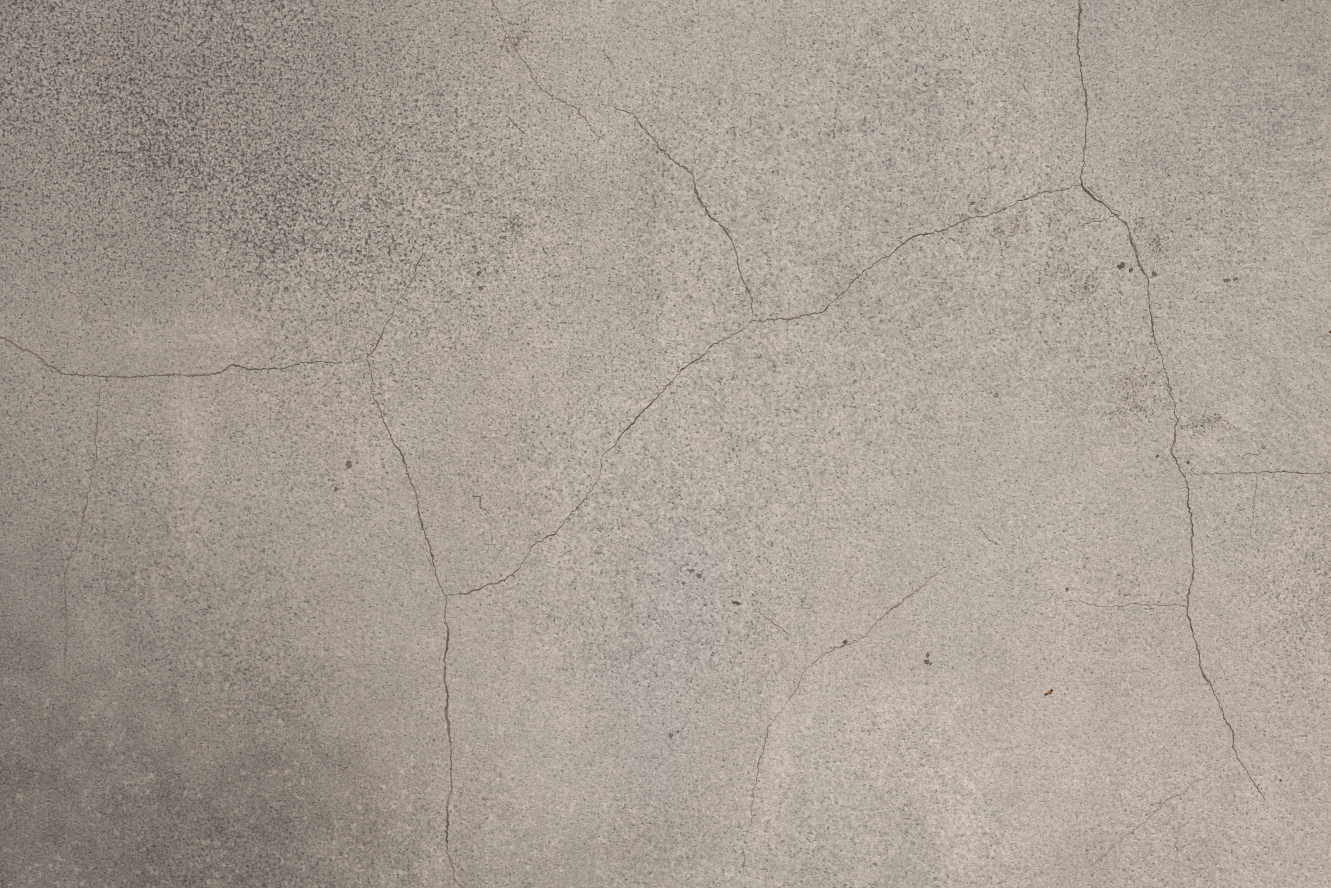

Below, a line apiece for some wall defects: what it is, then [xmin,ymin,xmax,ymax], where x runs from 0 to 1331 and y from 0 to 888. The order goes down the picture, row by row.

crack [0,337,351,681]
crack [366,0,1331,888]